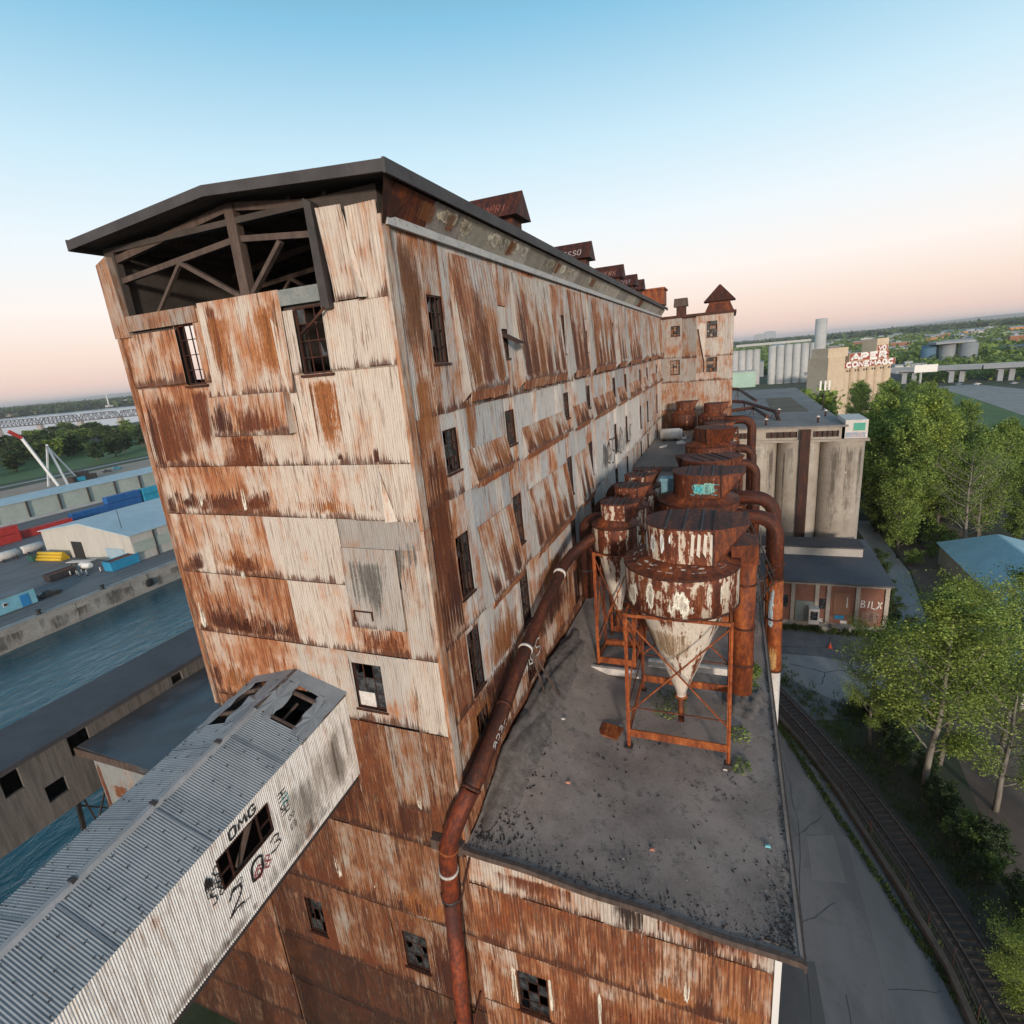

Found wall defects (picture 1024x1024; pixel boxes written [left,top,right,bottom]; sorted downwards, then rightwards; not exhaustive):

rust [205,307,235,386]
rust [247,300,281,375]
rust [398,236,425,359]
rust [460,283,506,449]
rust [517,294,642,376]
rust [309,380,343,462]
rust [165,488,270,514]
peeling [629,532,726,620]
rust [201,601,297,637]
rust [461,537,522,767]
rust [498,873,571,903]
rust [563,989,632,1024]